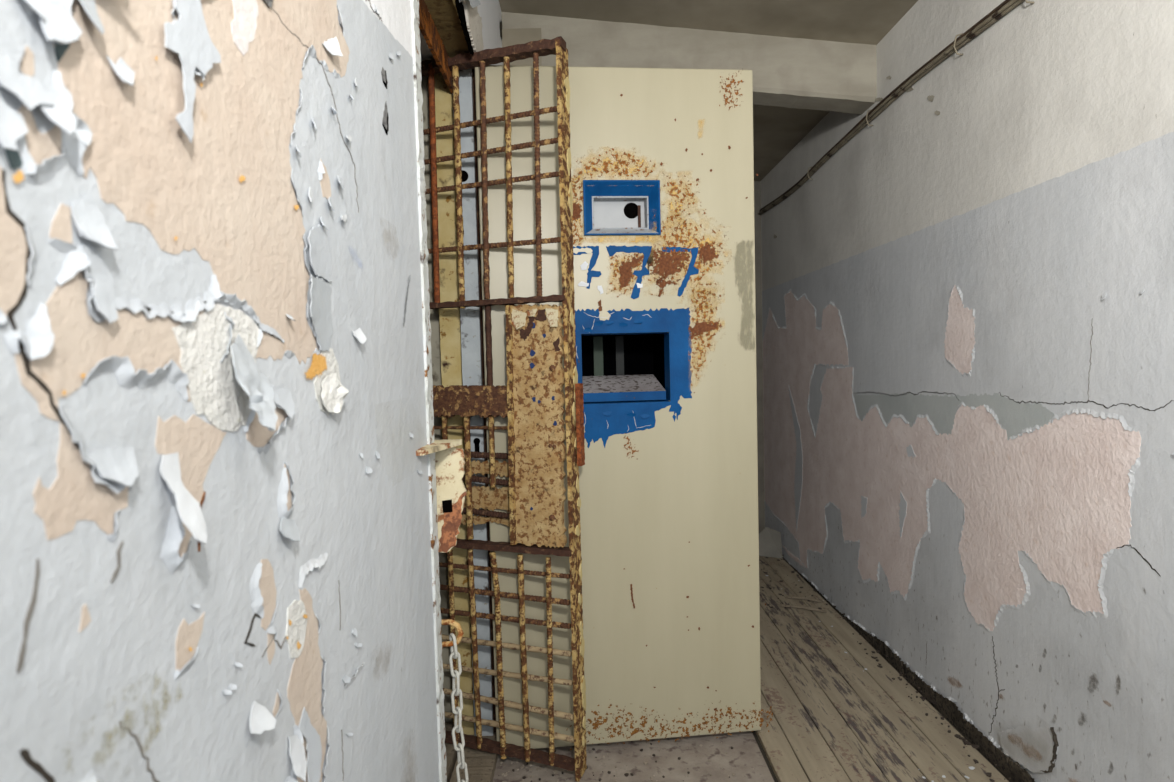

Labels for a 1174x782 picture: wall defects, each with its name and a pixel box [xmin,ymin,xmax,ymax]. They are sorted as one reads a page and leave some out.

crack [271,7,359,213]
crack [2,169,87,463]
peeling [0,0,358,574]
rust [572,148,729,393]
crack [854,390,957,398]
crack [999,318,1174,411]
rust [439,491,467,553]
peeling [763,285,1141,782]
crack [119,721,159,782]
peeling [174,604,205,680]
peeling [250,553,330,782]
rust [586,686,773,745]